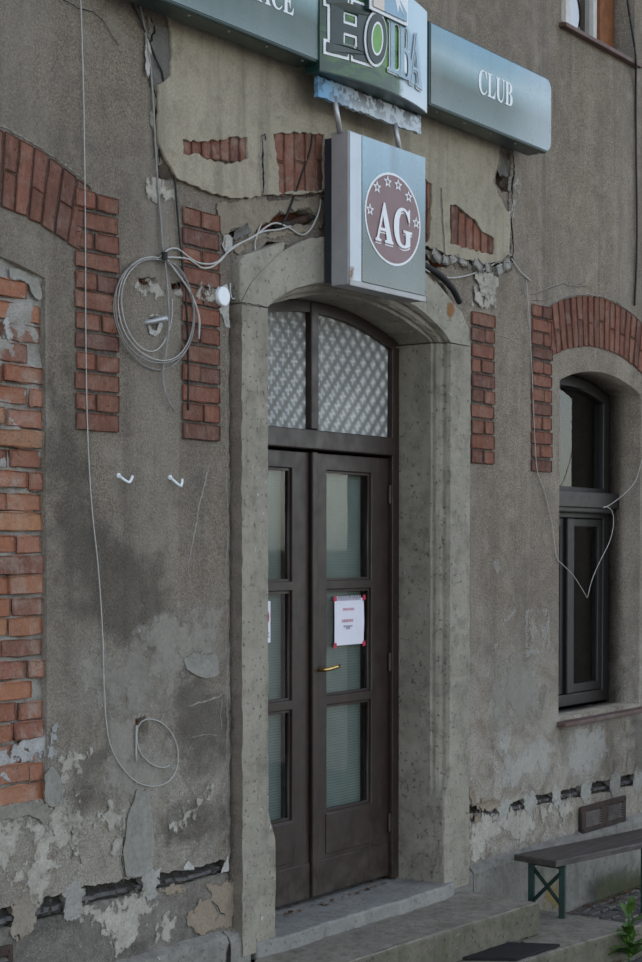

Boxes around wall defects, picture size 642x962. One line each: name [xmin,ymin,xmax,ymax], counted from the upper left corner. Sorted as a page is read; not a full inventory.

crack [60,0,119,46]
flaking render [144,16,171,163]
flaking render [146,175,176,205]
flaking render [183,136,246,164]
flaking render [217,132,325,255]
flaking render [425,149,521,309]
peeling [0,723,127,908]
peeling [169,782,214,832]
peeling [469,782,573,866]
peeling [79,851,234,958]